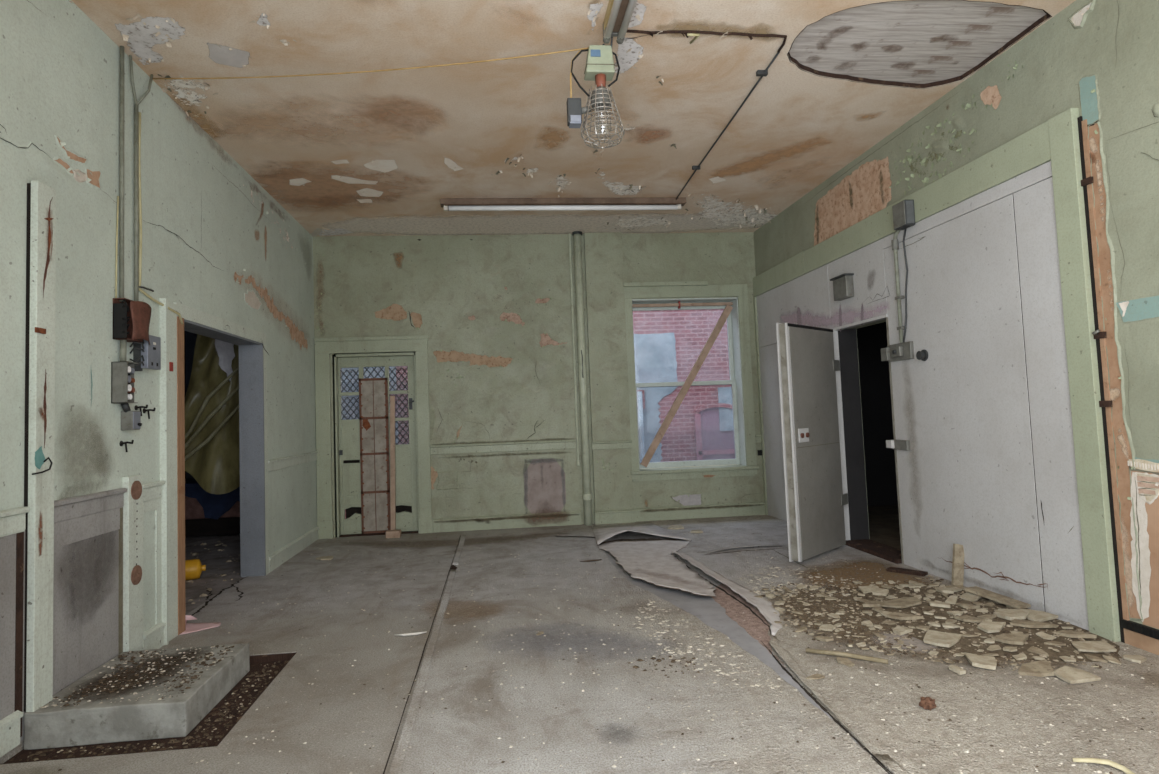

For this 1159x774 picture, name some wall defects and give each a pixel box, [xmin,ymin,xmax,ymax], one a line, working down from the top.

peeling [115,13,218,117]
peeling [614,2,647,74]
spalling [1069,0,1096,29]
crack [0,124,52,159]
crack [143,166,267,271]
water stain [256,166,410,208]
water stain [328,214,771,235]
peeling [605,177,781,231]
water stain [716,142,819,177]
peeling [814,156,892,246]
peeling [233,269,308,349]
flaking render [1088,122,1159,621]